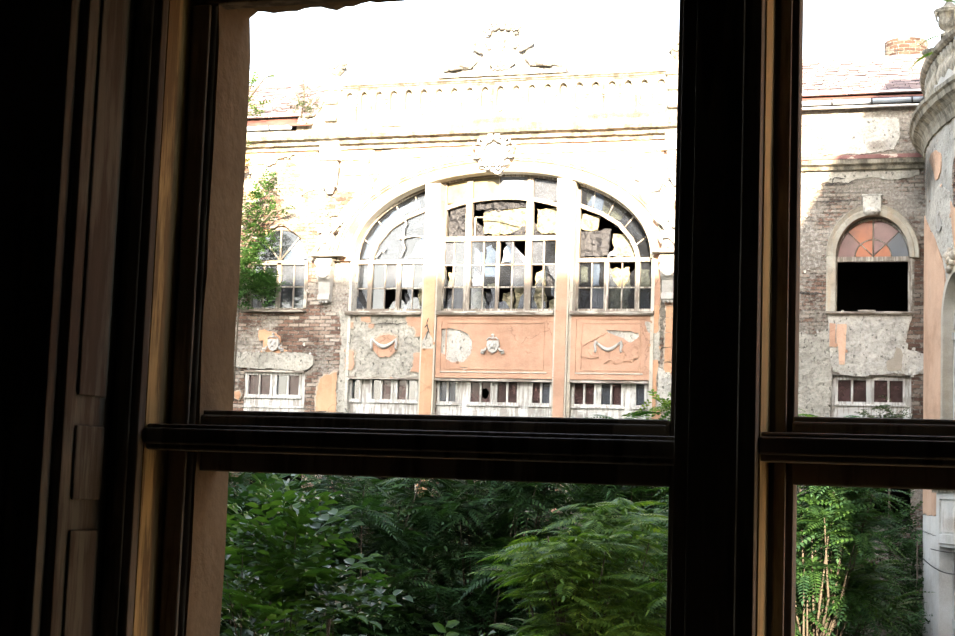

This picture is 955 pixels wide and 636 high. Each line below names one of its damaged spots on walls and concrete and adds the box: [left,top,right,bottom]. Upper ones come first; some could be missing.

peeling [605,149,675,223]
peeling [802,114,900,155]
flaking render [233,155,472,413]
peeling [607,279,672,420]
peeling [798,156,955,419]